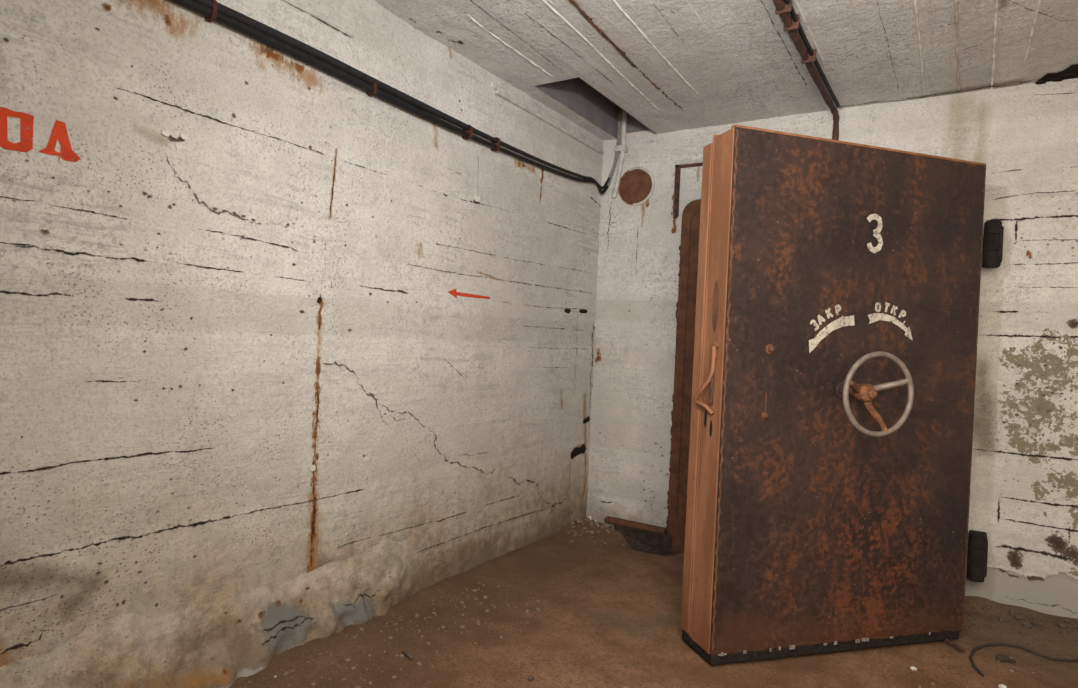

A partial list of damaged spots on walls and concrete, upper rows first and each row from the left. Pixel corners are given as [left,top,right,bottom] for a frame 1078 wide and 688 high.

corrosion [131,0,186,34]
corrosion [258,45,316,85]
corrosion [569,0,682,110]
crack [118,88,516,215]
crack [0,196,127,219]
crack [0,242,146,262]
crack [174,261,241,272]
crack [206,230,297,251]
crack [408,243,594,409]
crack [0,276,573,573]
peeling [965,319,1078,619]
spalling [258,586,316,651]